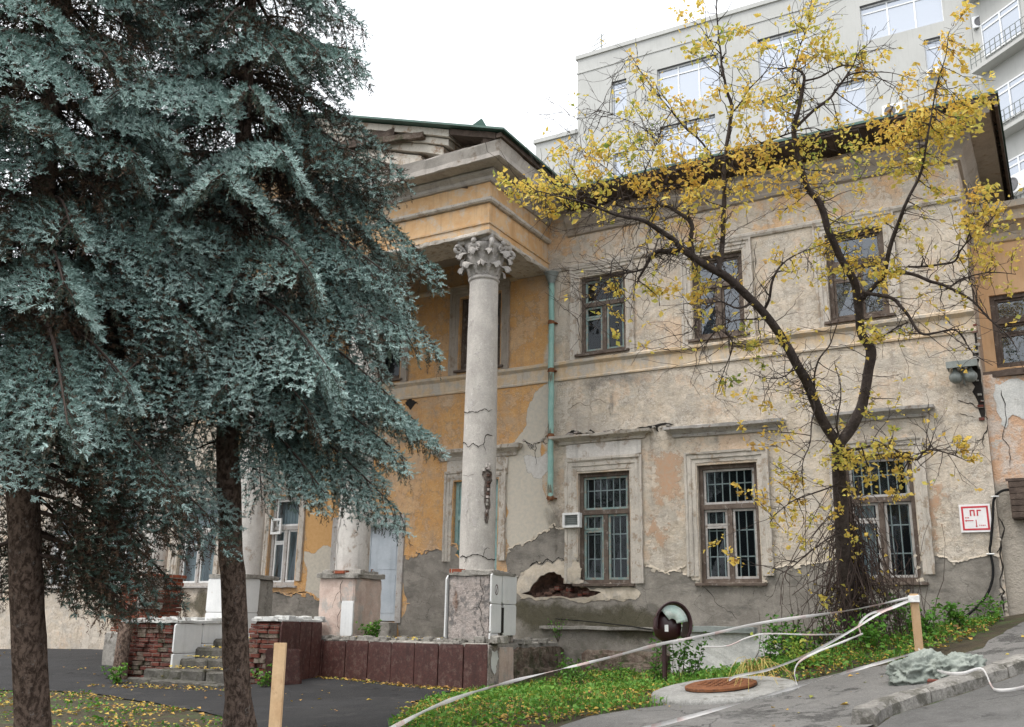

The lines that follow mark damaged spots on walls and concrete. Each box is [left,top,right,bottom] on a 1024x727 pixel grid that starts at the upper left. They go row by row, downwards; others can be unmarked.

crack [463,409,492,451]
crack [958,304,1011,459]
spalling [993,378,1024,428]
peeling [272,442,336,619]
crack [459,498,495,633]
peeling [505,381,845,668]
peeling [858,484,1006,633]